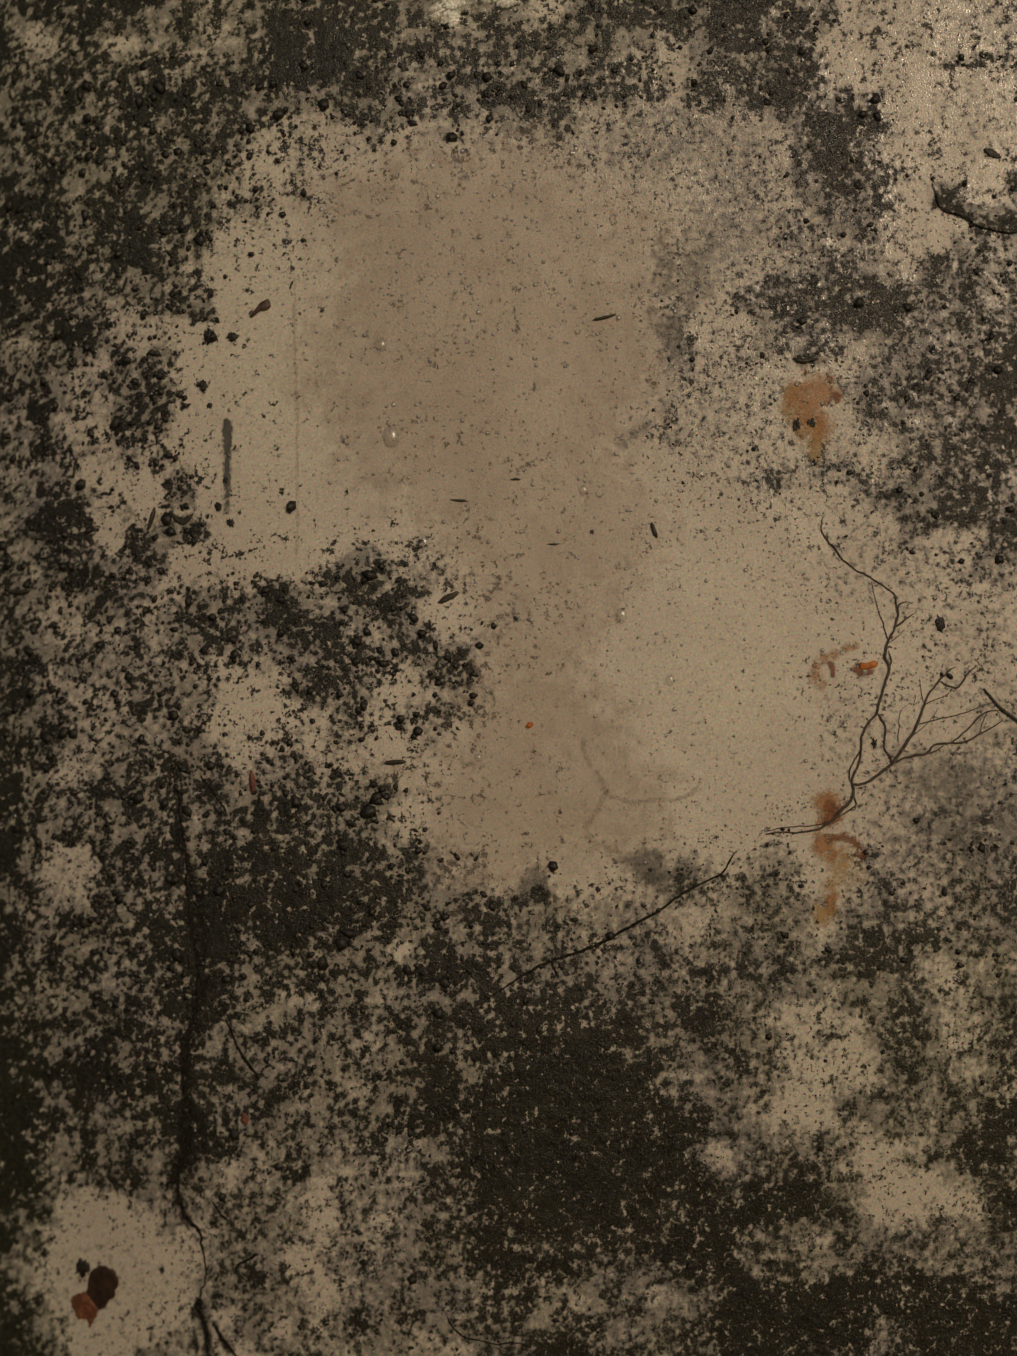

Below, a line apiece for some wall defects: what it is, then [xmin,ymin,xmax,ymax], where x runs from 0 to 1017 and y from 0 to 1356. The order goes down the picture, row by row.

water stain [0,0,1017,747]
corrosion [782,375,841,461]
corrosion [811,644,878,687]
mould [0,613,1017,1356]
crack [491,850,738,996]
corrosion [812,792,865,926]
crack [166,775,259,1356]